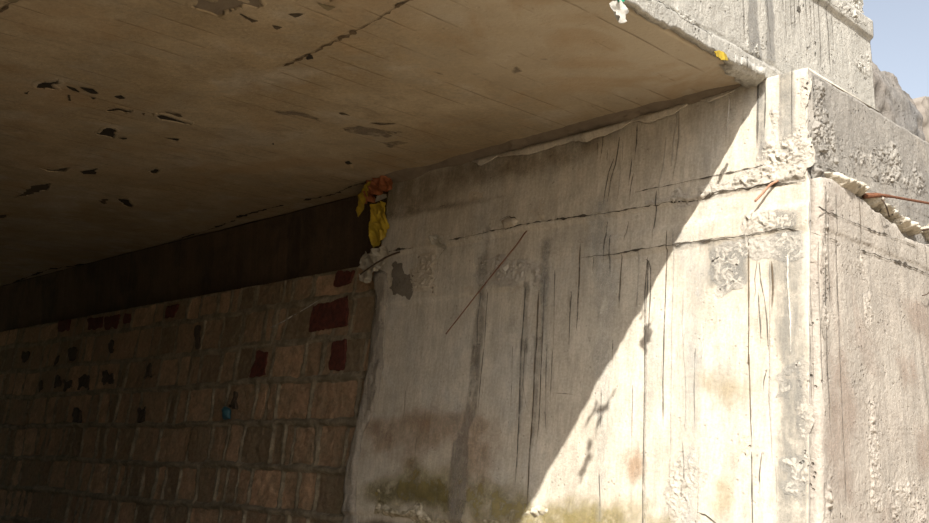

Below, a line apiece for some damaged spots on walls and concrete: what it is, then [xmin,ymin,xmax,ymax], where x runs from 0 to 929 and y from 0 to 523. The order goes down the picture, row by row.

peeling [185,0,280,23]
crack [284,0,412,66]
spalling [25,78,98,101]
crack [450,158,835,240]
crack [582,206,929,275]
spalling [389,261,413,300]
damp [449,292,488,523]
damp [511,273,566,489]
spalling [374,488,451,523]
spalling [524,504,549,517]